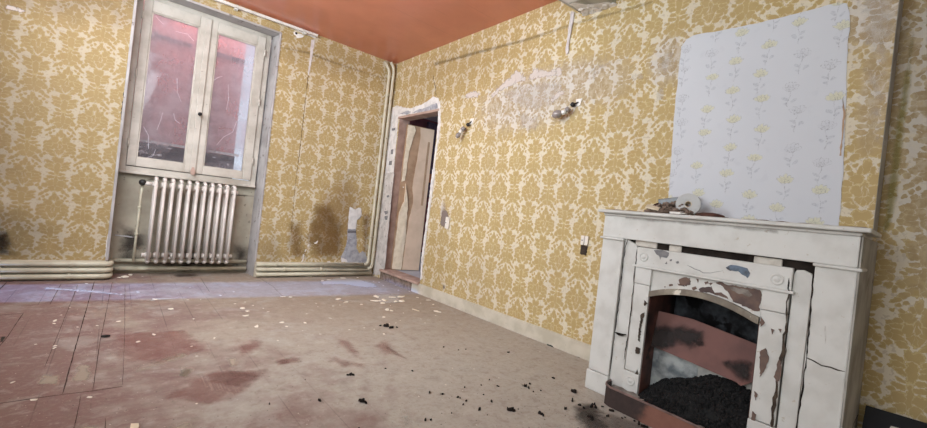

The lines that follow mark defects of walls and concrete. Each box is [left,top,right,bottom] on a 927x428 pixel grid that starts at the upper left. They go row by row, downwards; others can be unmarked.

water stain [313,208,338,253]
flaking render [341,97,441,280]